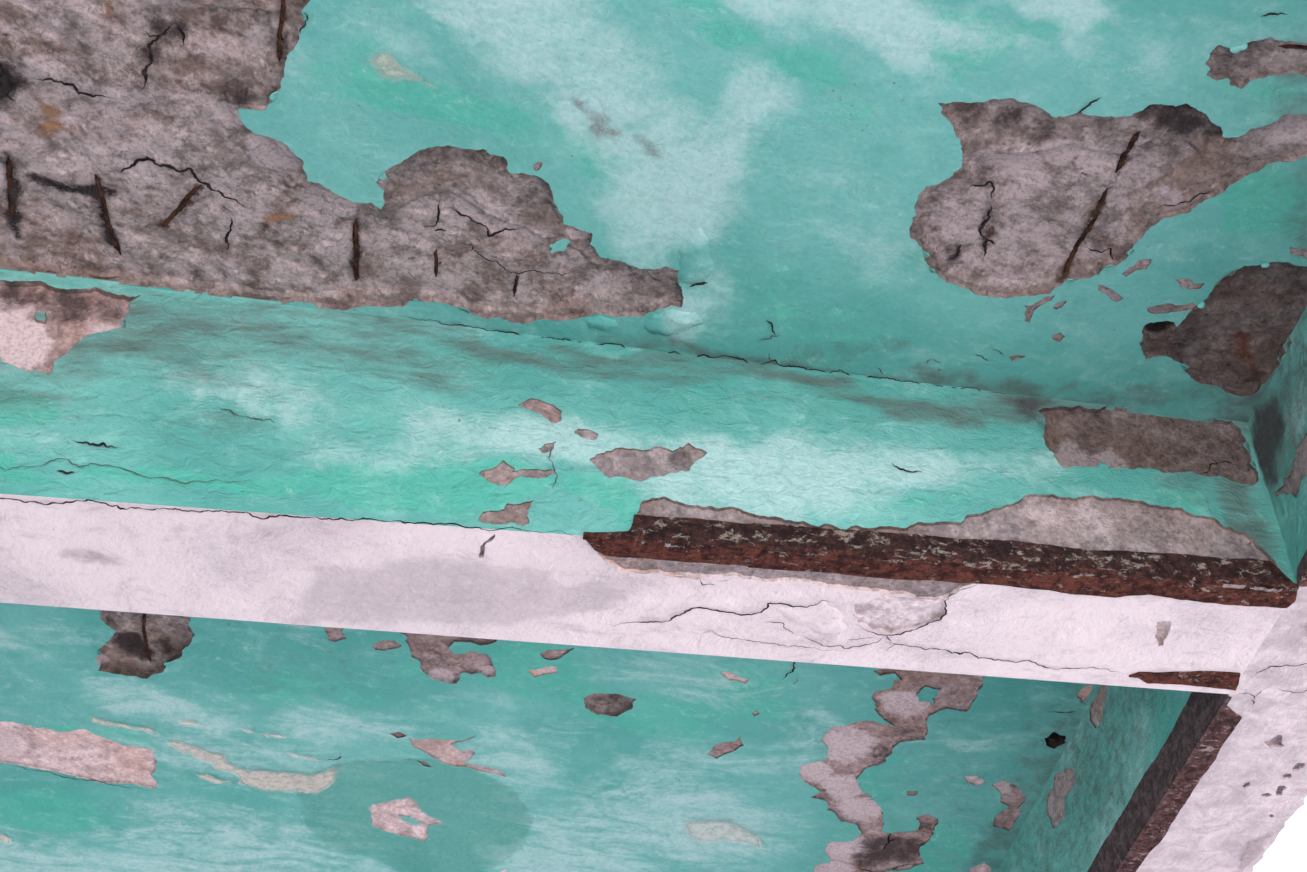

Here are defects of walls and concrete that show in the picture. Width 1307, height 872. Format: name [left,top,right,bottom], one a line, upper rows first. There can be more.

crack [110,156,248,250]
spalling [0,0,684,375]
crack [424,202,570,276]
spalling [909,98,1307,323]
spalling [1140,247,1307,396]
spalling [1039,405,1259,486]
spalling [637,494,1279,568]
spalling [96,610,195,679]
peeling [372,633,497,684]
crack [612,580,1128,713]
peeling [0,721,158,789]
peeling [799,669,984,872]